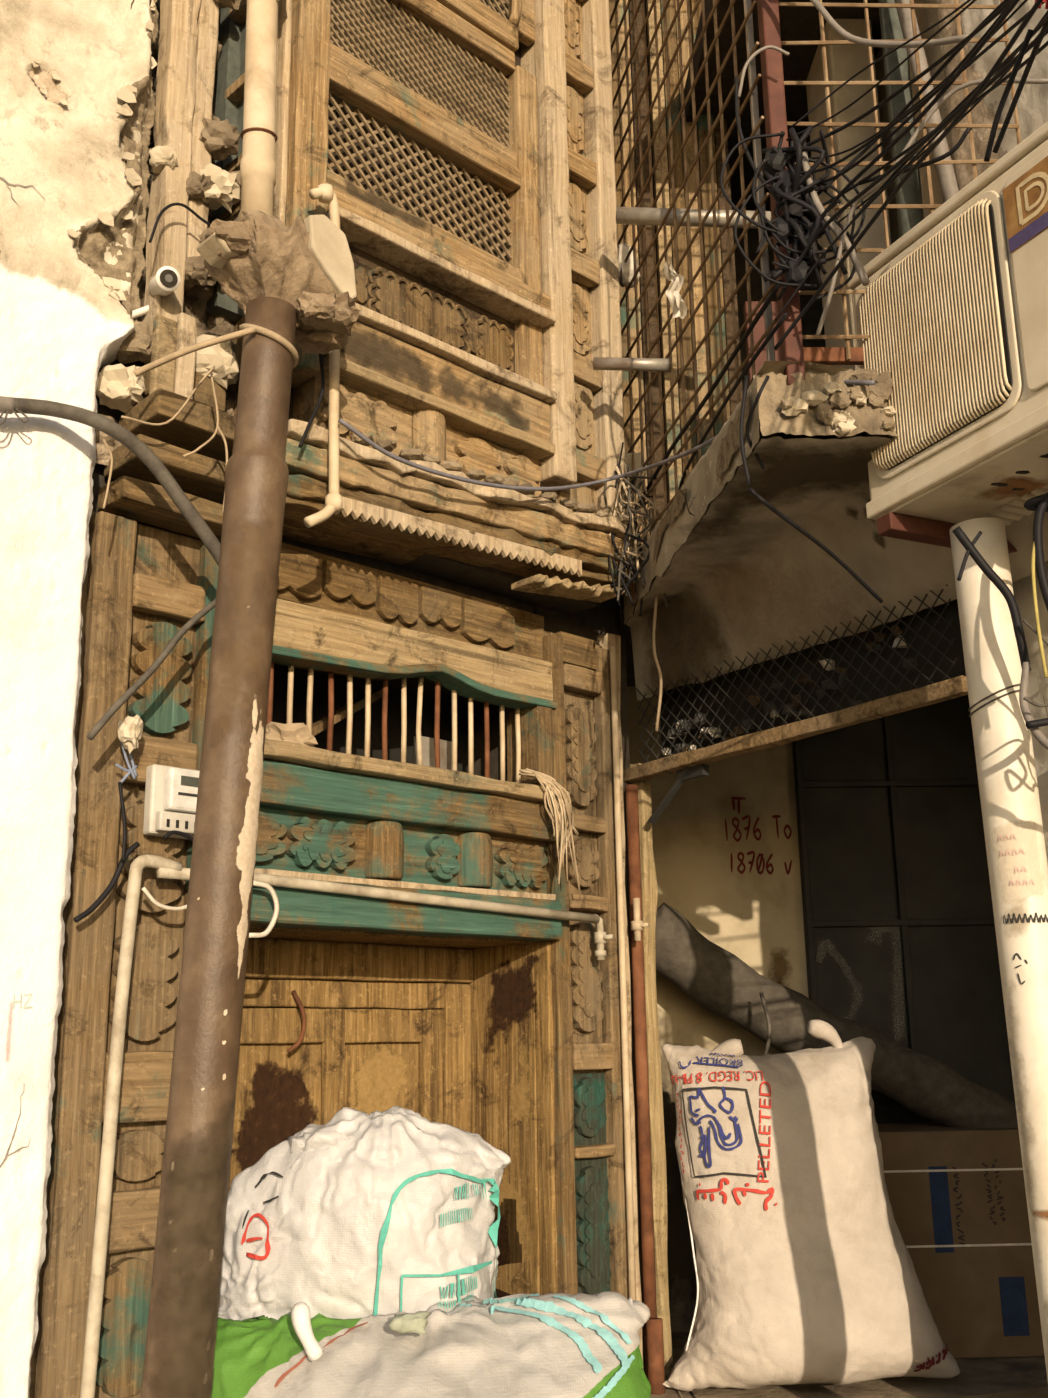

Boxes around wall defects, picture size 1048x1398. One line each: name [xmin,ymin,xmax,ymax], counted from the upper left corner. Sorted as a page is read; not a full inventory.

peeling [28,59,68,106]
spalling [67,0,159,322]